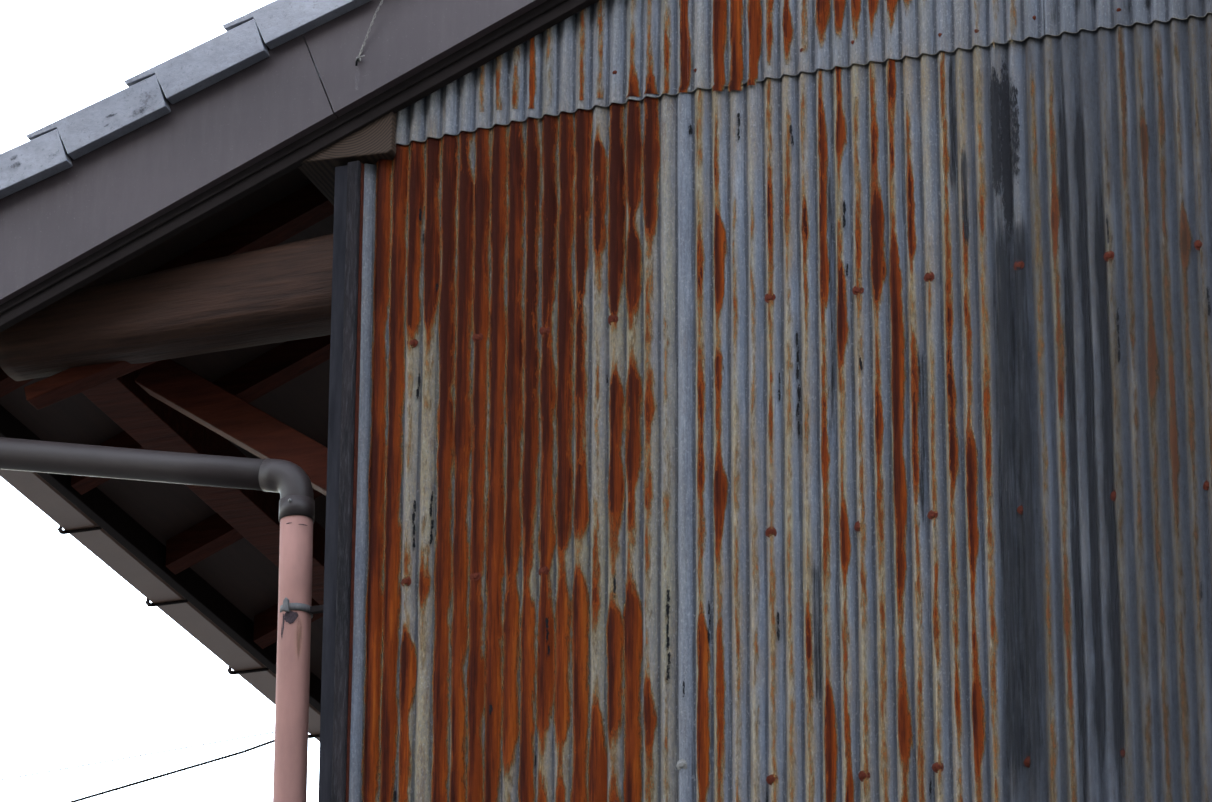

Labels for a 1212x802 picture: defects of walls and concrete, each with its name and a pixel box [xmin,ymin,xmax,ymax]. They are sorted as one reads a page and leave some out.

rust [361,0,999,802]
rust [1030,61,1077,802]
rust [1105,27,1212,802]